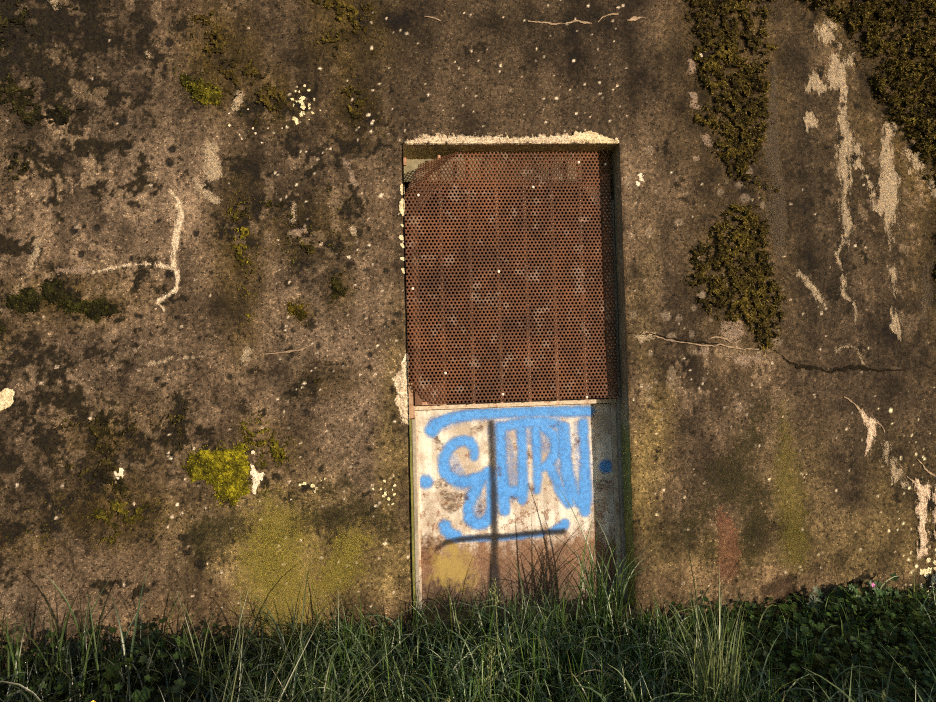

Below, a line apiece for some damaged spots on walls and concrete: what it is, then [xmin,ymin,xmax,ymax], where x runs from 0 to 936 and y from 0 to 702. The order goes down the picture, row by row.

damp [803,19,926,252]
crack [92,190,184,312]
damp [796,269,825,307]
crack [835,246,858,320]
damp [890,307,902,341]
crack [629,332,906,373]
spalling [0,388,15,411]
crack [844,396,885,456]
damp [880,440,909,489]
rust [422,535,443,565]